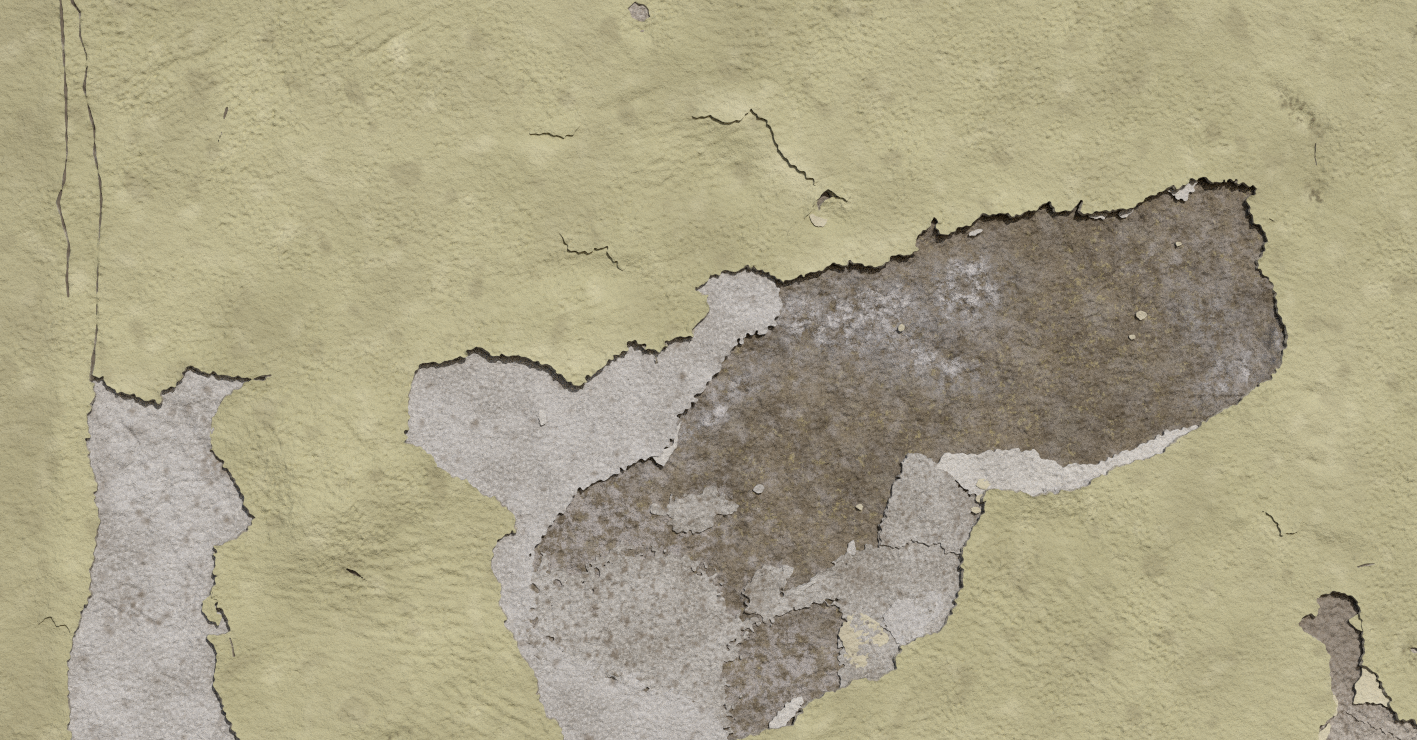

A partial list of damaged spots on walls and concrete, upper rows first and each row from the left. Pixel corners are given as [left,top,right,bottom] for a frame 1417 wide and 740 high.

crack [57,0,103,297]
crack [90,327,98,380]
flaking render [67,367,265,740]
flaking render [404,178,1286,740]
flaking render [1299,592,1417,740]